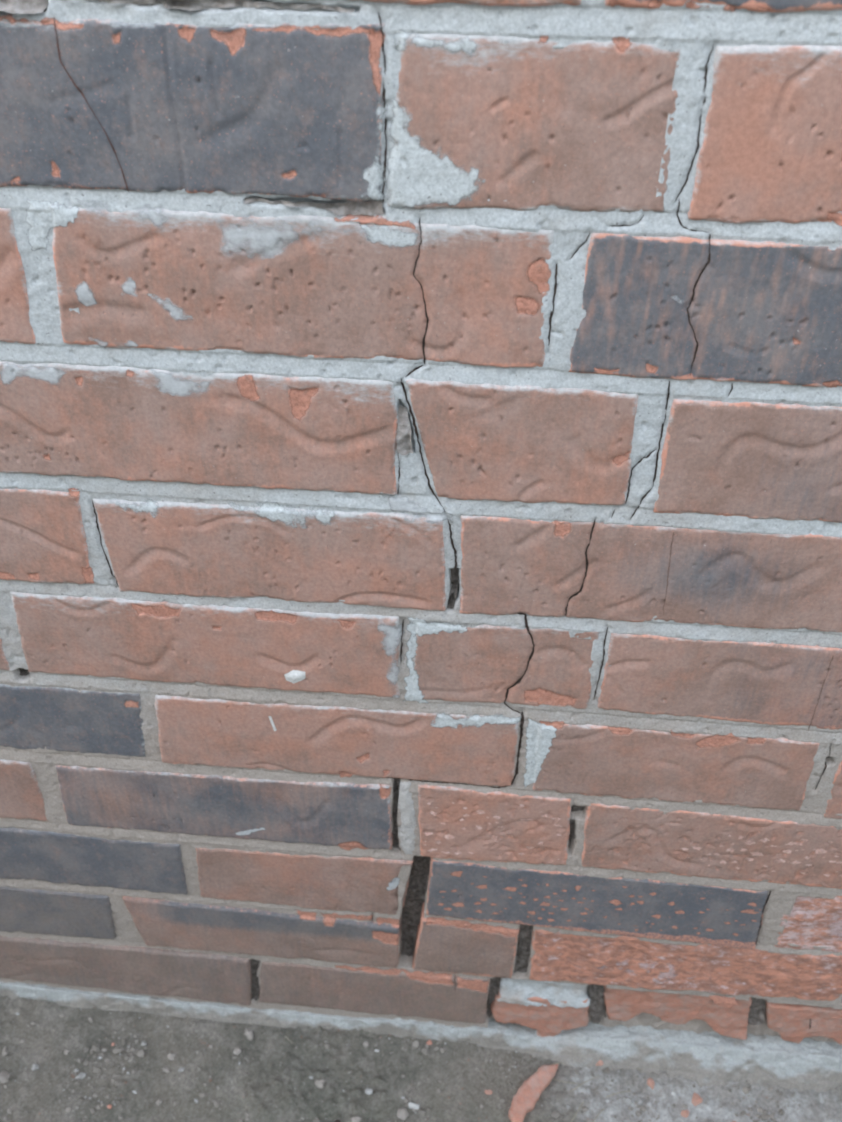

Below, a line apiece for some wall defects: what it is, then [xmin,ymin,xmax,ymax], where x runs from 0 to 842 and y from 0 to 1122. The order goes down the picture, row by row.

crack [54,17,129,192]
crack [398,218,457,570]
crack [548,215,644,346]
crack [565,44,714,616]
crack [381,613,535,788]
peeling [379,770,401,851]
spalling [297,802,842,1045]